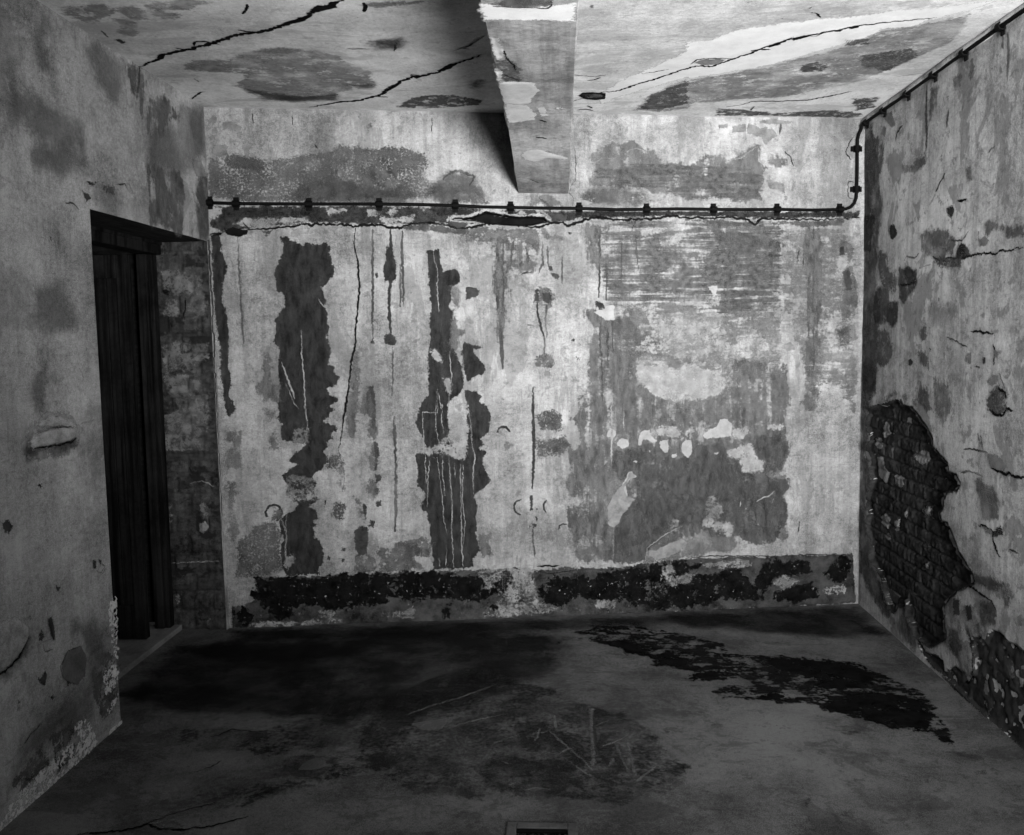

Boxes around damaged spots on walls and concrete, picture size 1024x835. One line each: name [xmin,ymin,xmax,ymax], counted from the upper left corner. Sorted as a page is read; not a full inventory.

crack [139,0,344,67]
crack [292,36,484,131]
crack [574,17,937,101]
peeling [521,137,567,162]
peeling [864,111,902,195]
water stain [91,46,490,417]
crack [905,232,1023,270]
water stain [1006,224,1024,239]
crack [209,149,859,522]
water stain [131,125,956,744]
peeling [208,151,1024,750]